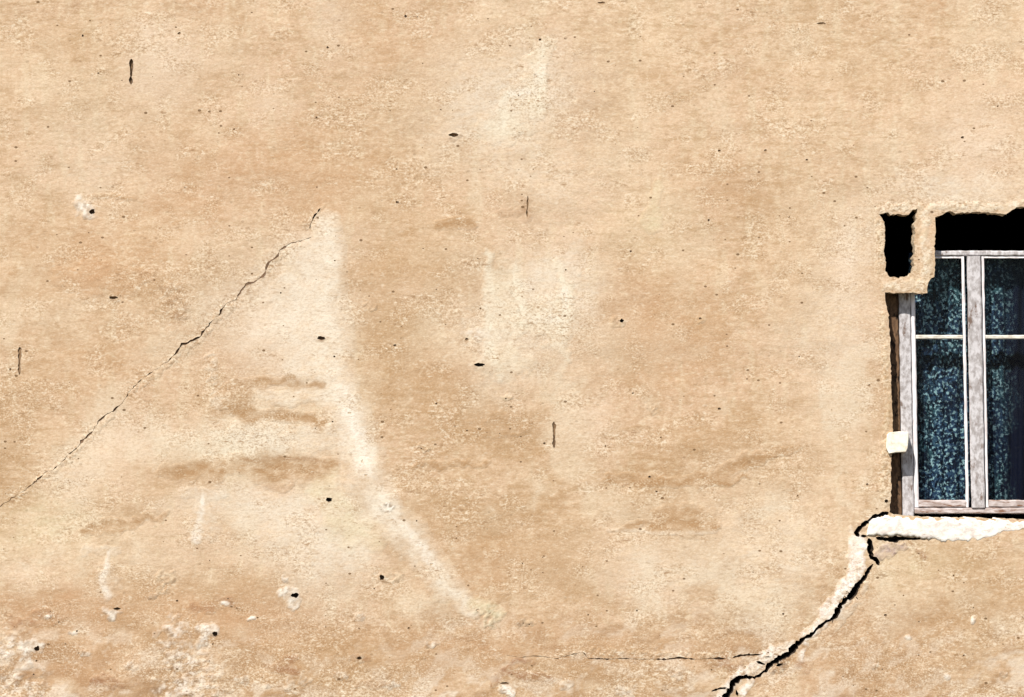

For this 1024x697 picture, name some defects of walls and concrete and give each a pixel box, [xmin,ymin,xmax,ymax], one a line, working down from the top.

flaking render [874,198,1024,293]
crack [1,203,326,506]
crack [508,511,925,697]